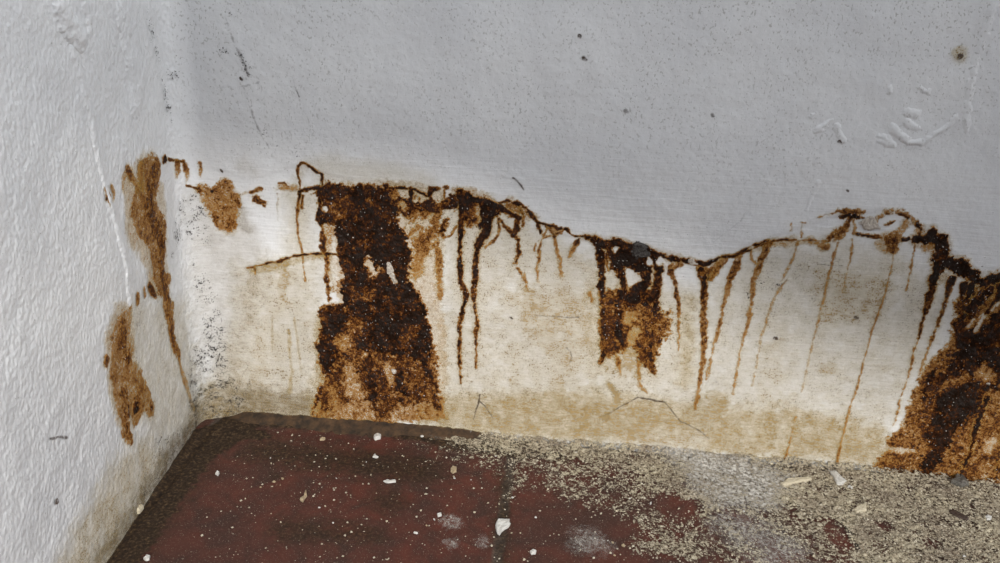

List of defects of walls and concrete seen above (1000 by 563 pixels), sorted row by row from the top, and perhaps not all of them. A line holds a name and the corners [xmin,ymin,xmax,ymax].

rust [103,152,267,446]
damp [68,257,322,563]
rust [278,161,1000,484]
damp [438,214,904,473]